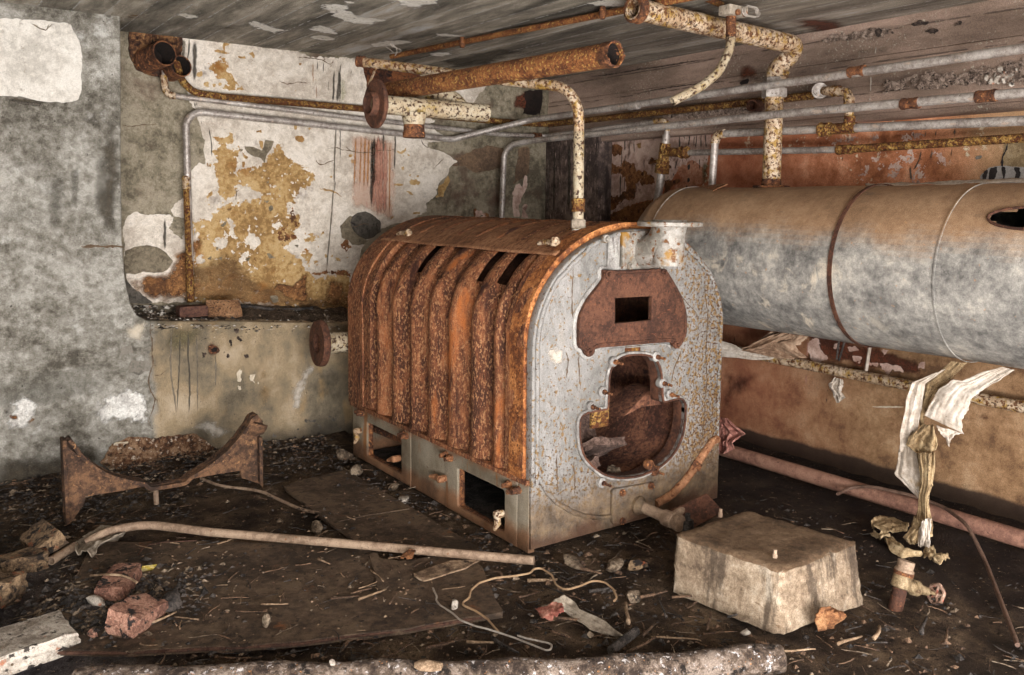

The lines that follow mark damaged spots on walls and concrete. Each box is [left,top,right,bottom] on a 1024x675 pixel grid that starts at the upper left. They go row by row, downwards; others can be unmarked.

peeling [123,38,504,309]
rust [353,135,396,217]
peeling [610,135,711,222]
peeling [858,132,951,183]
peeling [808,338,903,374]